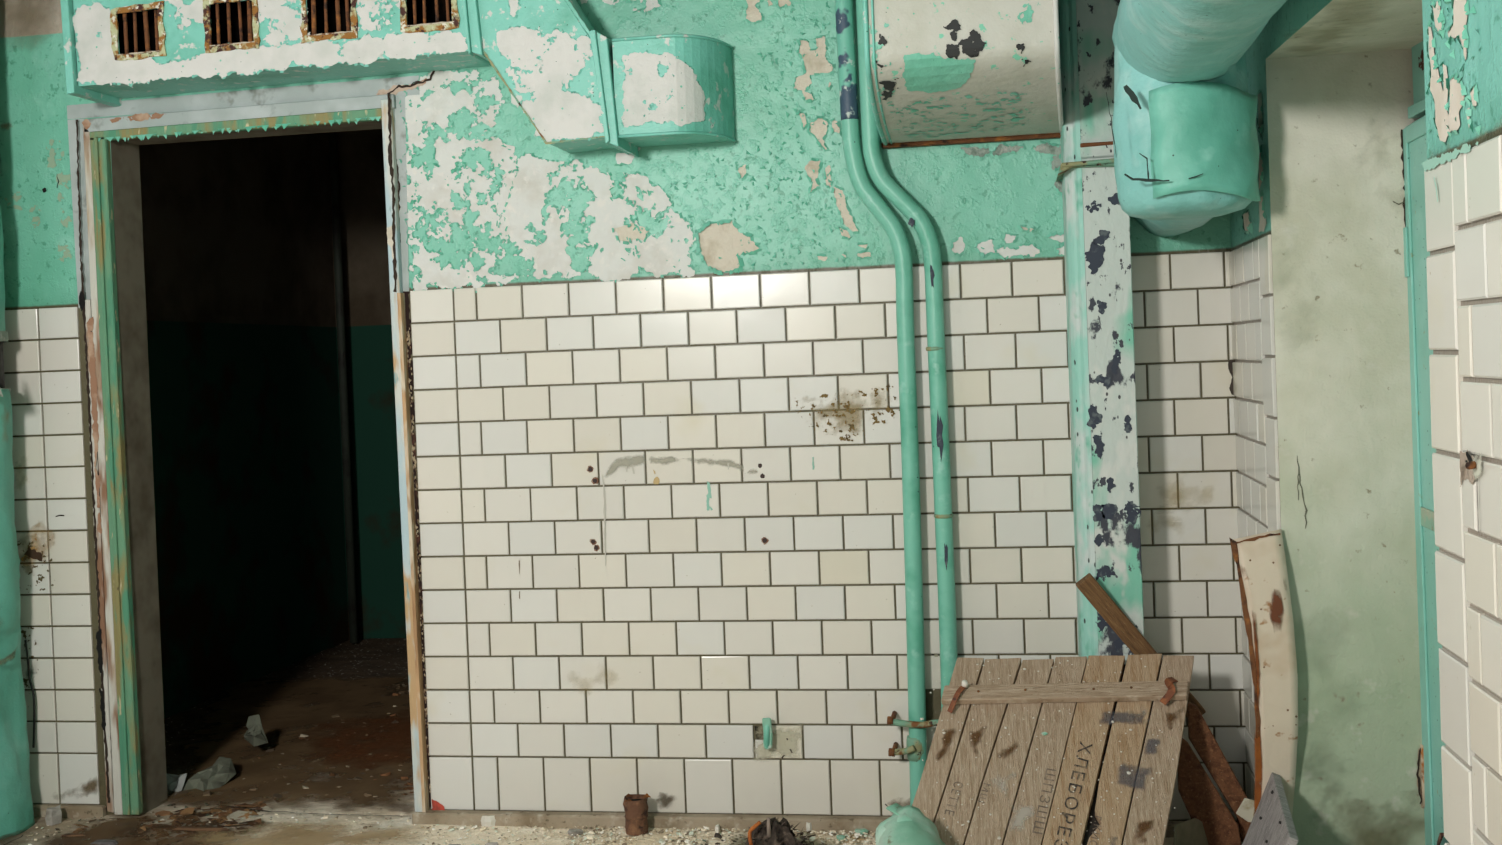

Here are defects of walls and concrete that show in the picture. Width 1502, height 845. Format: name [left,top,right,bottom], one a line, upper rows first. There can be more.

peeling [943,19,986,59]
peeling [877,64,899,100]
peeling [1418,0,1479,145]
peeling [72,0,762,293]
peeling [1085,193,1120,213]
peeling [1085,230,1110,274]
peeling [1093,349,1121,390]
peeling [1087,405,1105,459]
peeling [1124,415,1132,433]
peeling [1093,477,1141,547]
peeling [1096,565,1118,580]